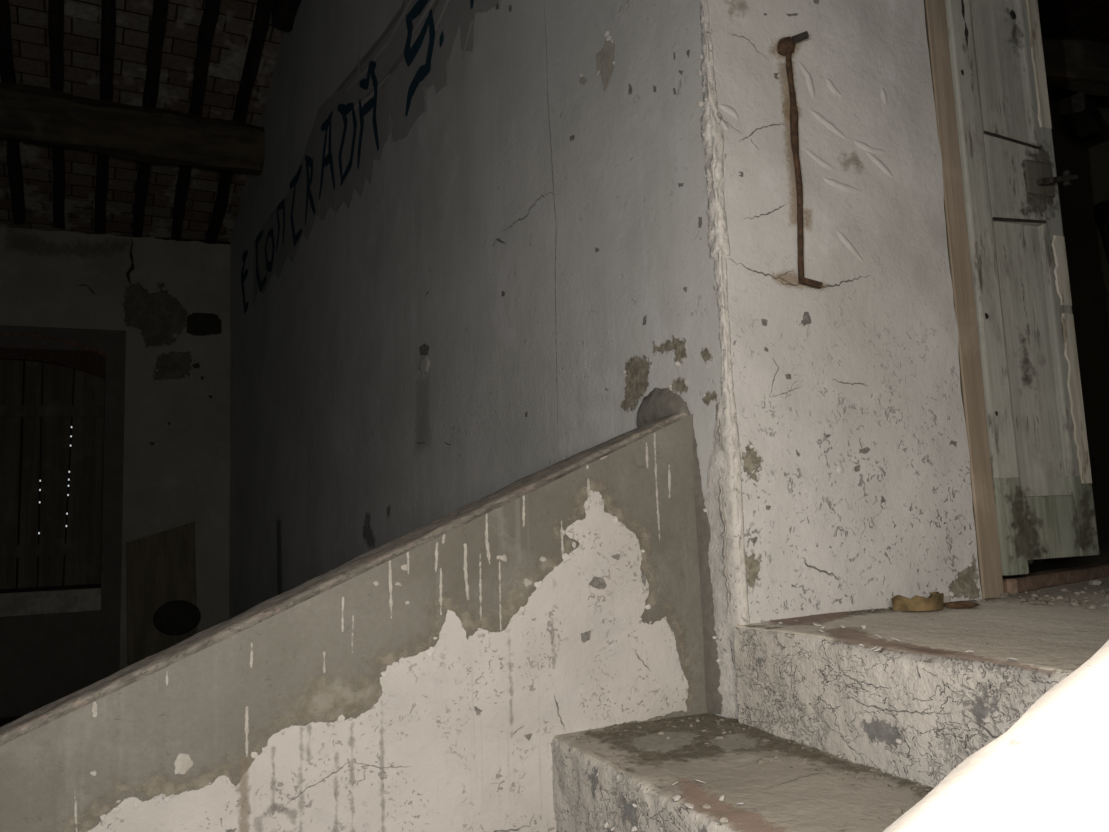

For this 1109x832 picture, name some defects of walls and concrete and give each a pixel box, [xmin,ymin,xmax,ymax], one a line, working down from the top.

peeling [579,31,615,91]
crack [126,236,135,285]
flaking render [123,283,204,380]
flaking render [621,337,689,412]
peeling [63,481,699,832]